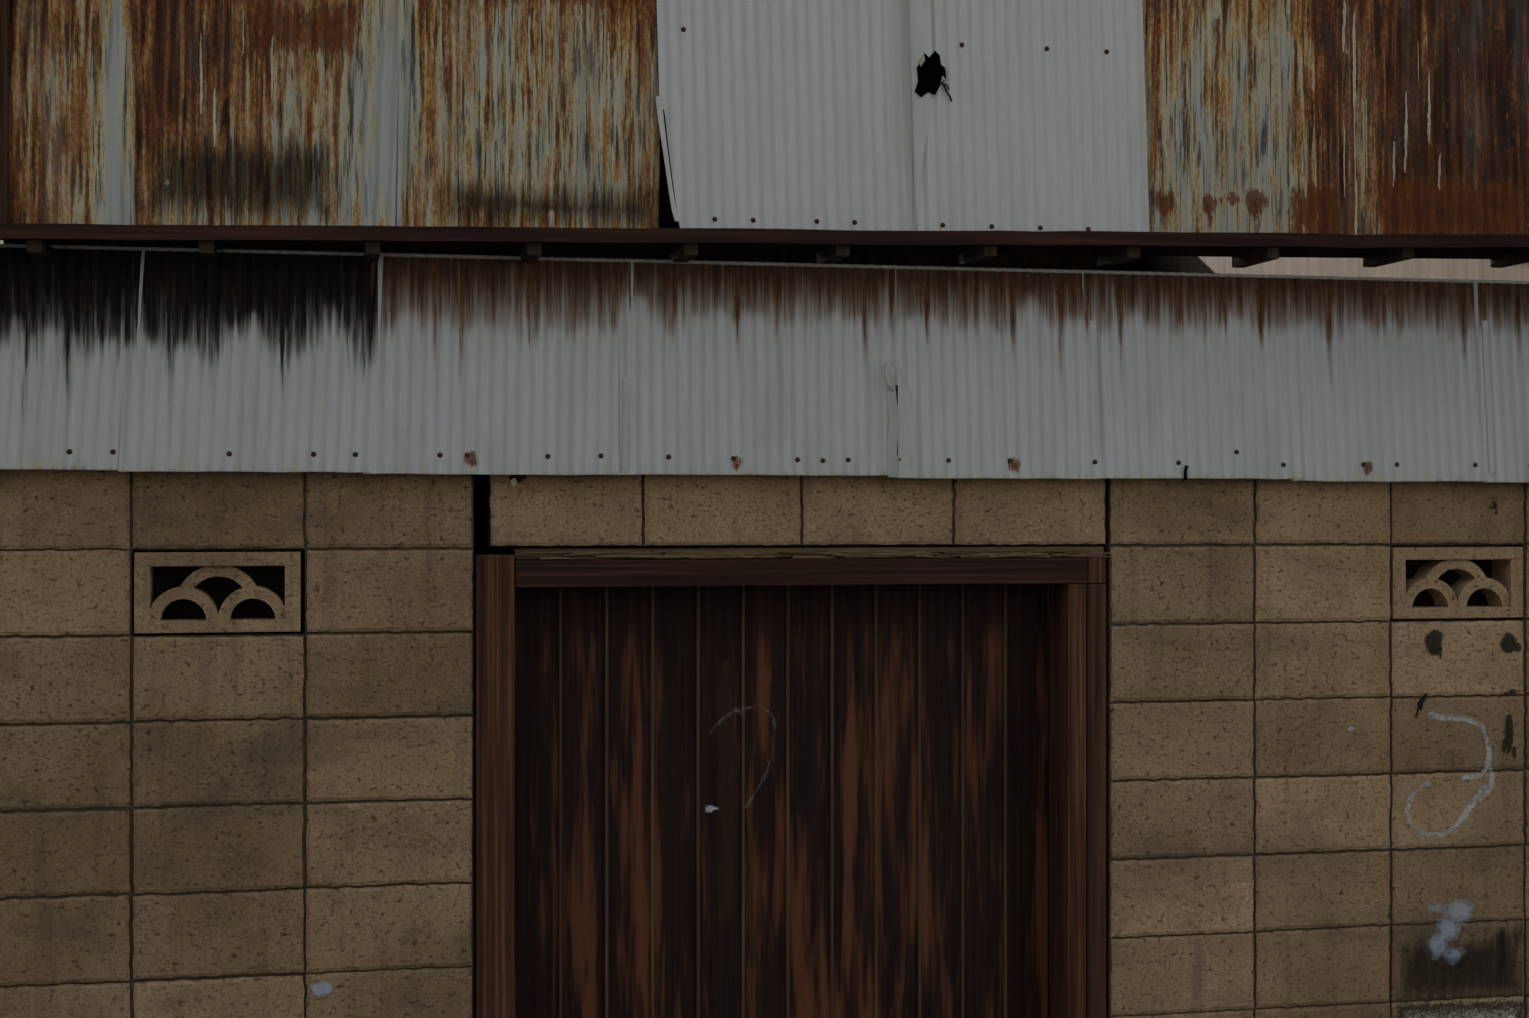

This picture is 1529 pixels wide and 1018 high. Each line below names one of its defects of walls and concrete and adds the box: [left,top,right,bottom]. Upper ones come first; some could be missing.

rust [247,0,361,116]
rust [441,0,652,111]
rust [1182,0,1194,137]
rust [1214,1,1253,128]
rust [1154,191,1175,229]
rust [1203,189,1267,233]
rust [1290,184,1340,234]